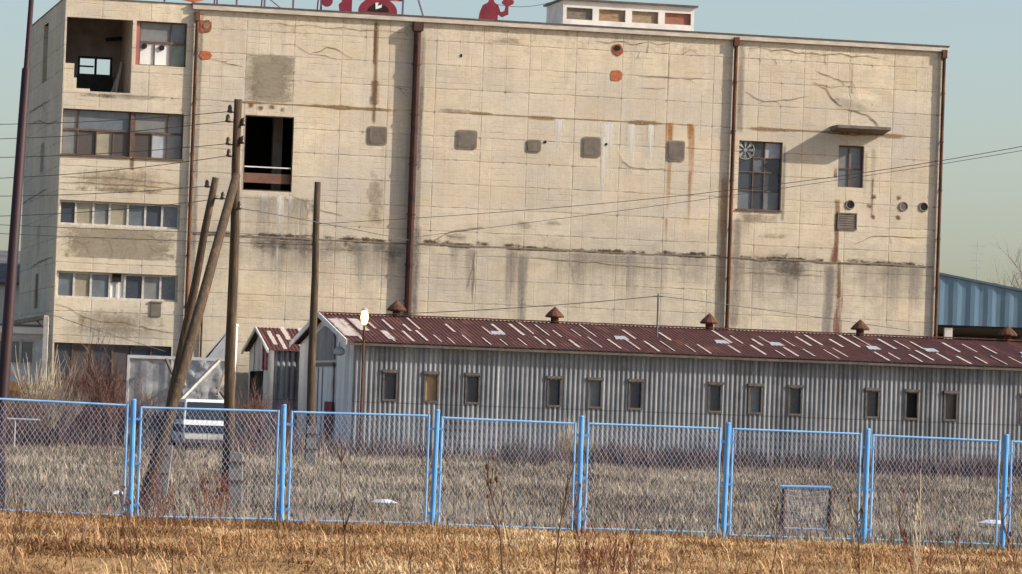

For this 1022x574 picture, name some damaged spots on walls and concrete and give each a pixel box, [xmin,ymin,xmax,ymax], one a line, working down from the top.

rust [243,24,389,122]
crack [268,23,405,59]
crack [746,47,880,127]
rust [825,201,841,332]
water stain [335,300,675,351]